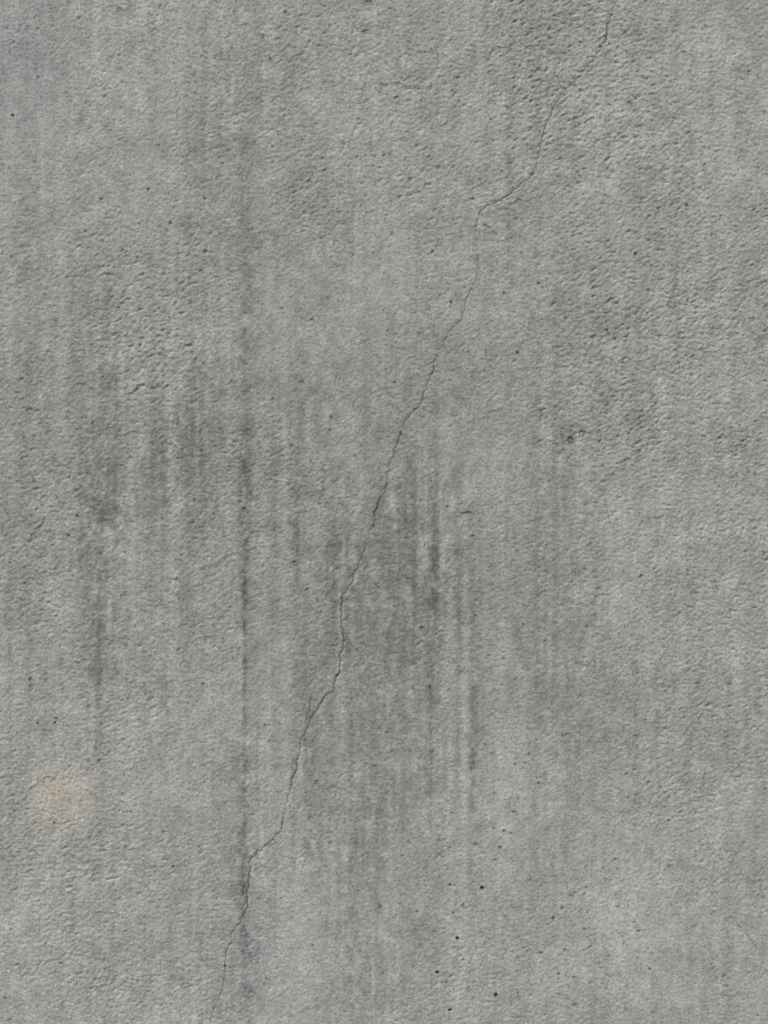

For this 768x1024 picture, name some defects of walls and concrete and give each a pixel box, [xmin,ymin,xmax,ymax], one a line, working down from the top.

crack [166,0,617,1024]